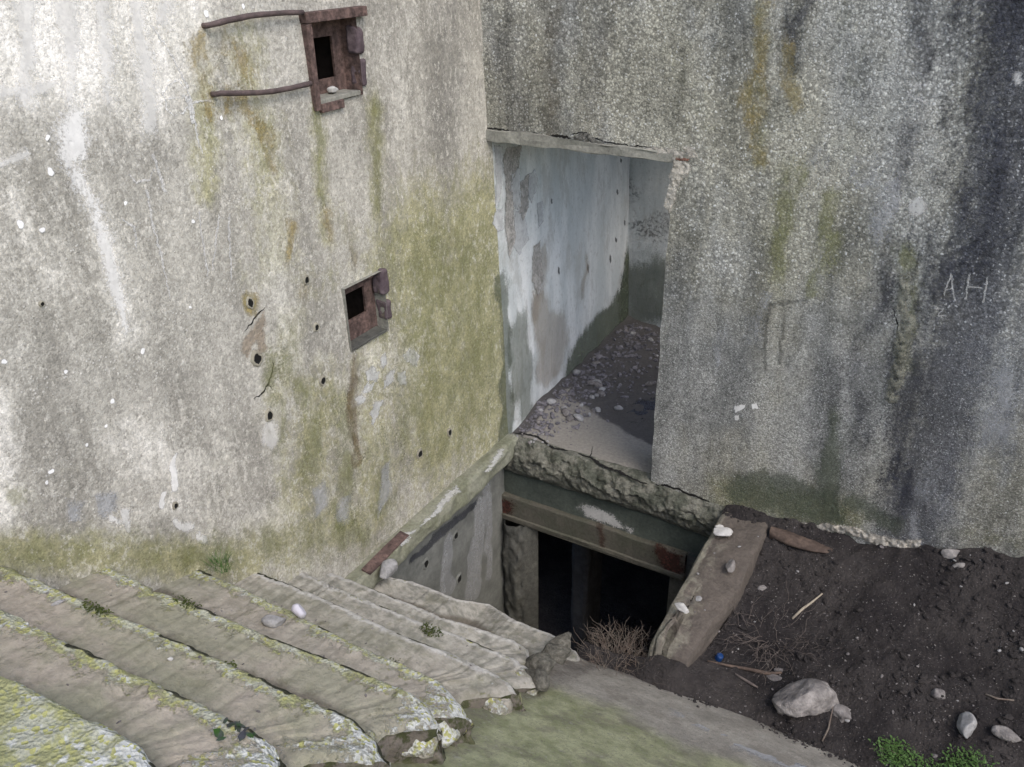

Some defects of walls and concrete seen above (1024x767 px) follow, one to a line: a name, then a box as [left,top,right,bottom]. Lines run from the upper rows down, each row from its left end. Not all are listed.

peeling [492,145,552,296]
damp [856,0,1024,540]
damp [566,249,629,377]
crack [255,363,274,398]
damp [734,403,758,420]
crack [515,432,709,502]
damp [109,508,130,532]
damp [173,519,207,543]
corrosion [361,531,409,575]
damp [409,502,476,563]
corrosion [502,499,513,516]
corrosion [655,543,685,579]